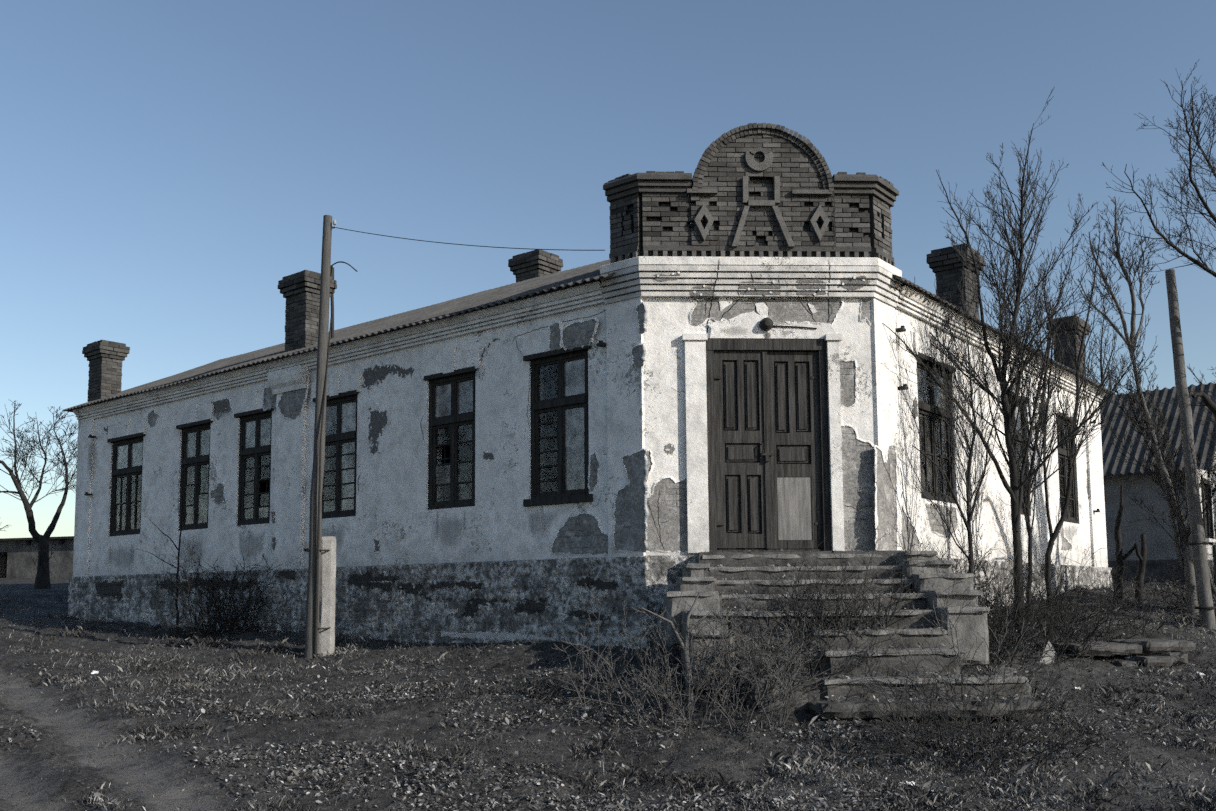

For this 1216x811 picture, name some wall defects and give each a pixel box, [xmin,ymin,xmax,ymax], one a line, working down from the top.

peeling [548,317,599,351]
peeling [688,276,865,327]
peeling [858,298,876,326]
peeling [262,366,309,421]
peeling [362,362,414,392]
peeling [839,359,859,407]
peeling [368,407,391,456]
peeling [550,448,688,557]
peeling [841,423,958,551]